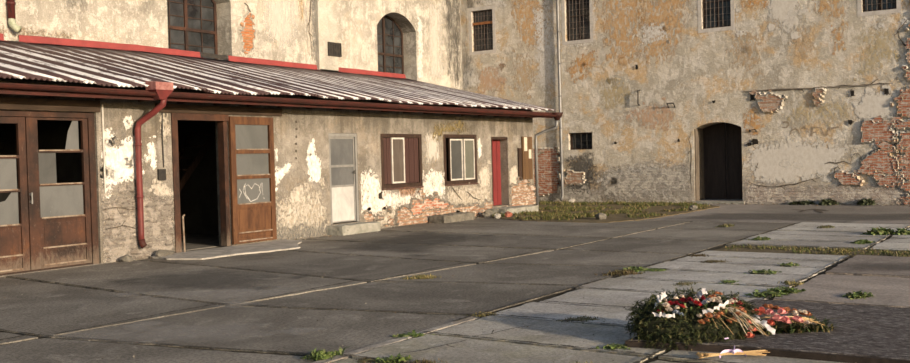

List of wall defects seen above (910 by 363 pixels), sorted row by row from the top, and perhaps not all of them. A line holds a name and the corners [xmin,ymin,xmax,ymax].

flaking render [238,5,256,55]
peeling [726,0,910,205]
spalling [100,112,176,263]
peeling [266,121,330,241]
spalling [360,139,692,228]